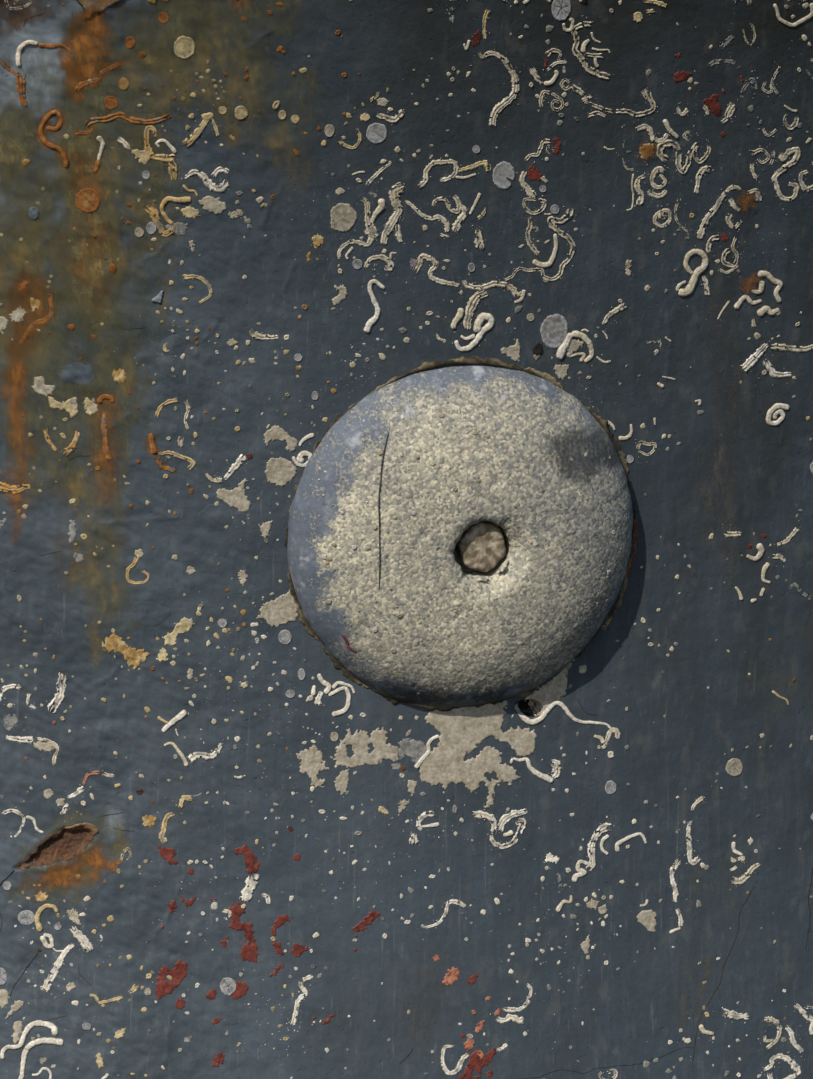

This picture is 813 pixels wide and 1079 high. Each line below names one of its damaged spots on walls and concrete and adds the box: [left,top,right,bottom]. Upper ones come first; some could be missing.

corrosion [37,0,125,337]
corrosion [6,276,44,447]
spalling [515,699,541,717]
spalling [16,822,99,870]